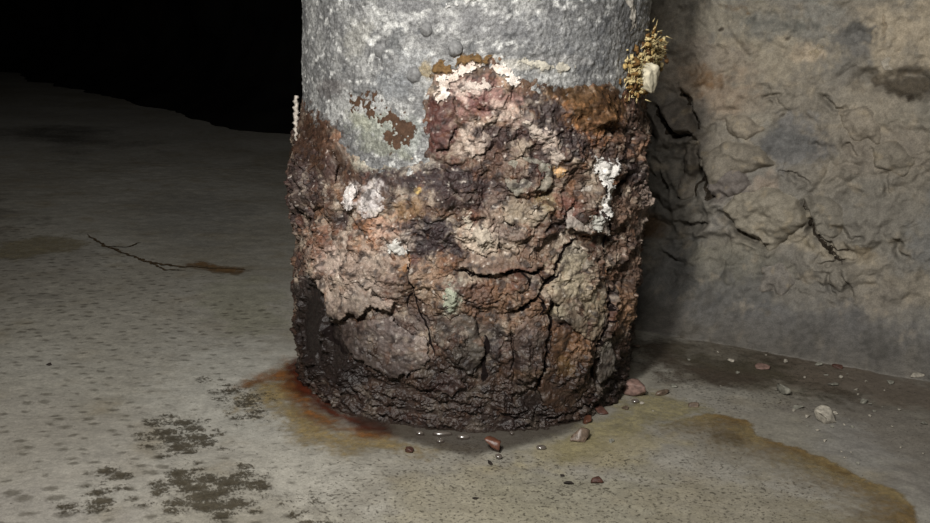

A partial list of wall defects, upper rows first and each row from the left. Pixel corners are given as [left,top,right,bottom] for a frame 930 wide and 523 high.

crack [87,234,253,270]
crack [322,323,348,354]
crack [405,243,435,358]
rust [244,54,655,454]
crack [452,237,577,393]
crack [590,217,620,380]
damp [589,156,622,233]
crack [651,89,715,201]
damp [643,340,794,388]
crack [803,201,849,262]
damp [52,375,335,523]
damp [686,413,916,523]